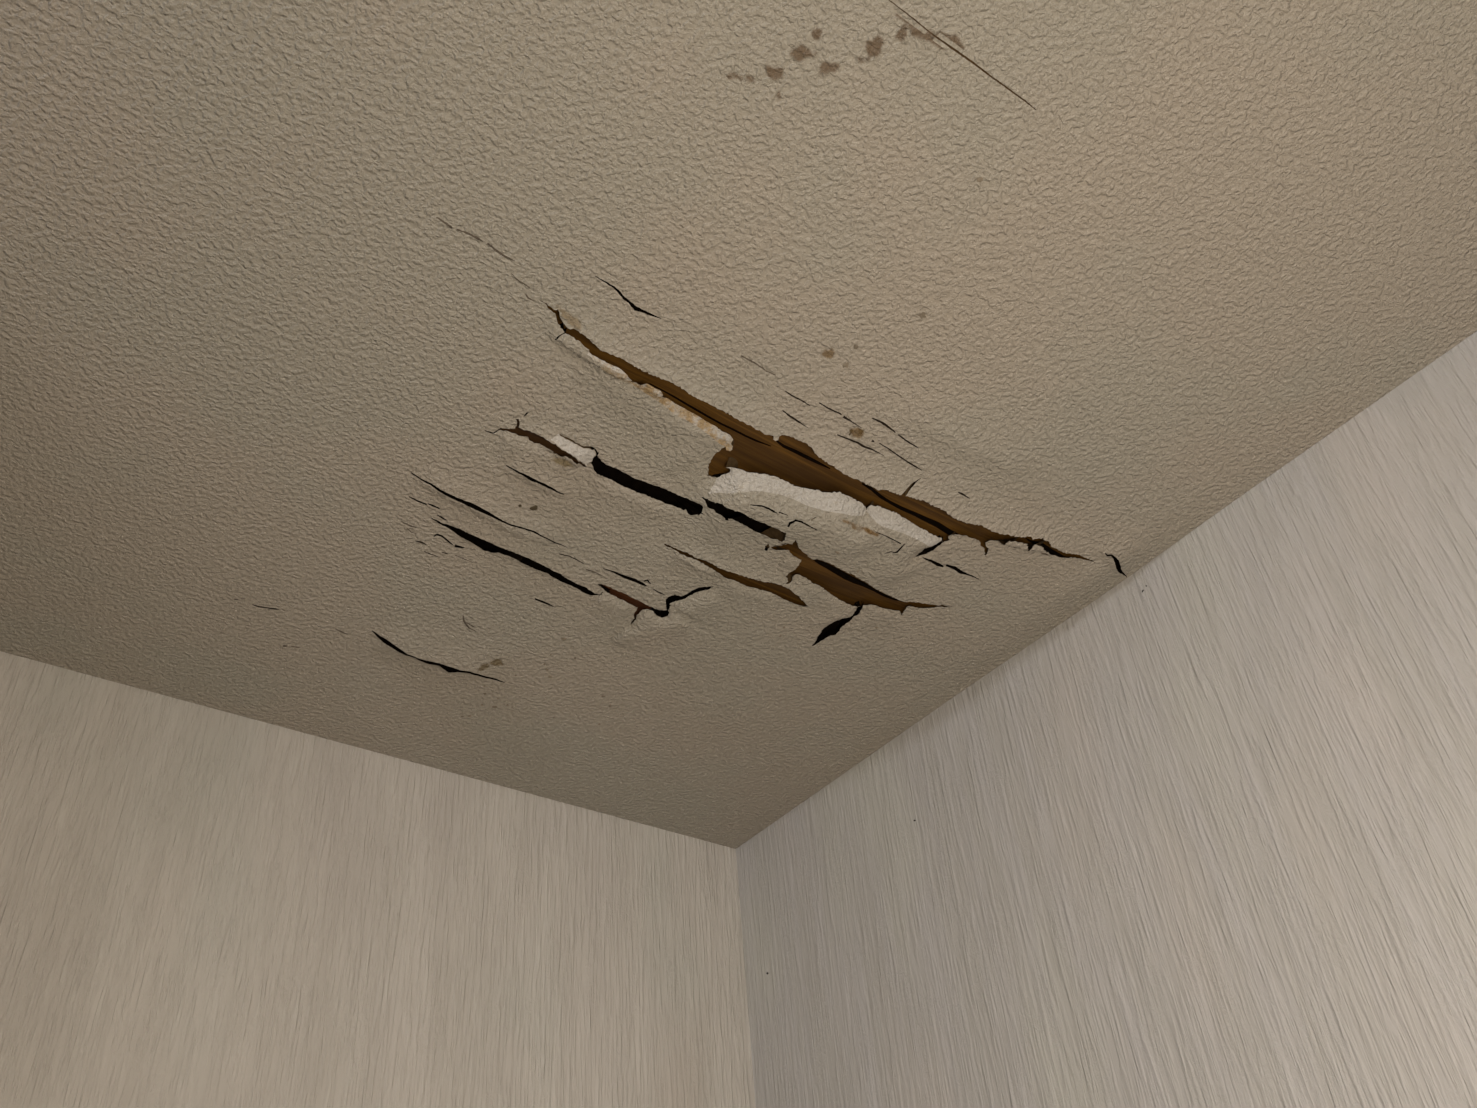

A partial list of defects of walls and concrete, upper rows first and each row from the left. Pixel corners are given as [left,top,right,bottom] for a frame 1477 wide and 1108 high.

crack [436,217,534,301]
crack [595,276,661,319]
crack [741,355,922,471]
crack [485,412,817,539]
crack [401,473,807,624]
crack [875,508,978,579]
crack [1105,553,1127,577]
crack [336,629,505,683]